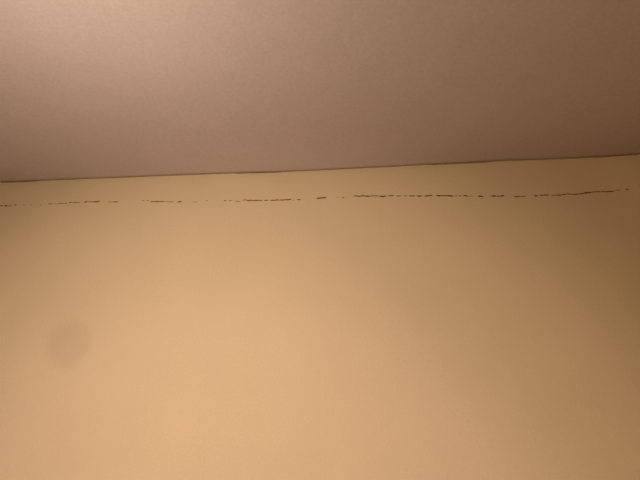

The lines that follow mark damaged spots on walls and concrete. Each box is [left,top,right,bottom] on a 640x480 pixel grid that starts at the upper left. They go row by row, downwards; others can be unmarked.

crack [317,189,629,199]
crack [224,196,301,204]